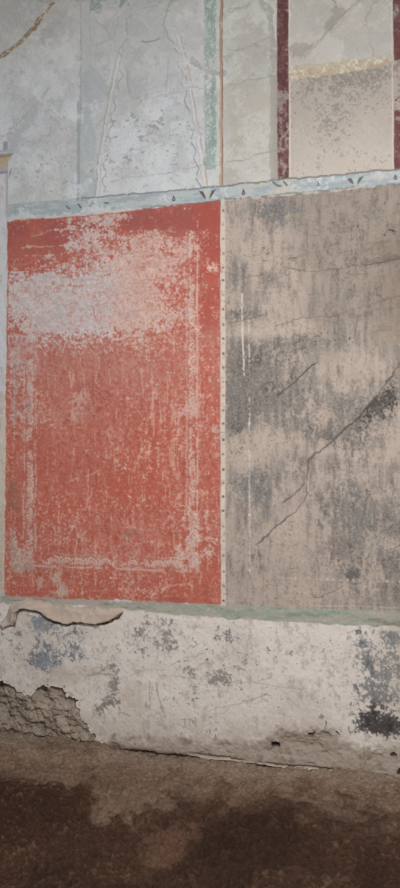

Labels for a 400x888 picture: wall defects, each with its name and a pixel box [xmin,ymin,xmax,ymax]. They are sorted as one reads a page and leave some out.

peeling [6,211,220,436]
crack [254,361,400,546]
peeling [166,502,220,573]
spalling [0,677,400,778]
damp [347,615,400,747]